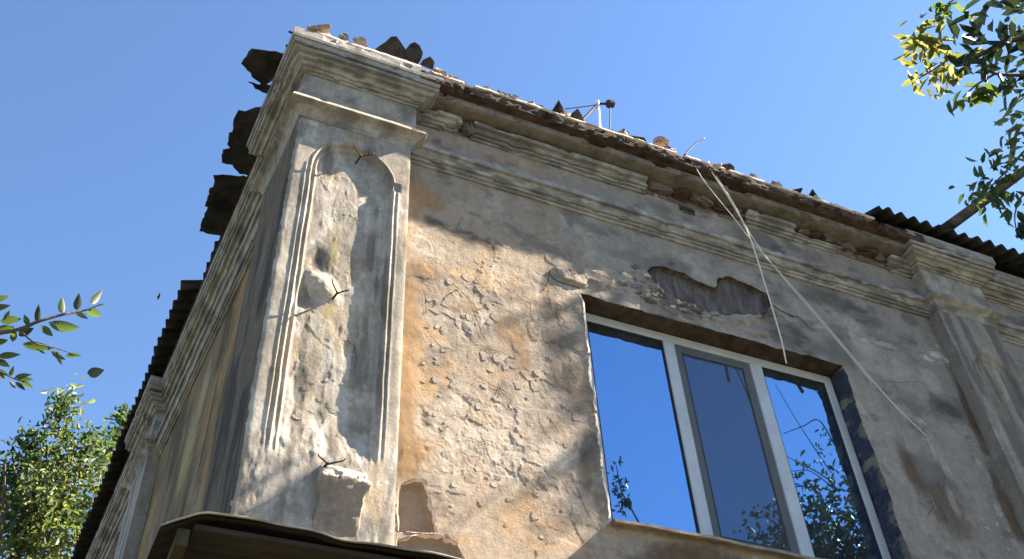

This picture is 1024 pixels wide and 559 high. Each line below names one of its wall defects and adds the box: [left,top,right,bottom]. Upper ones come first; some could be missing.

flaking render [796,228,887,264]
spalling [618,265,771,319]
spalling [563,295,611,518]
spalling [397,479,466,559]